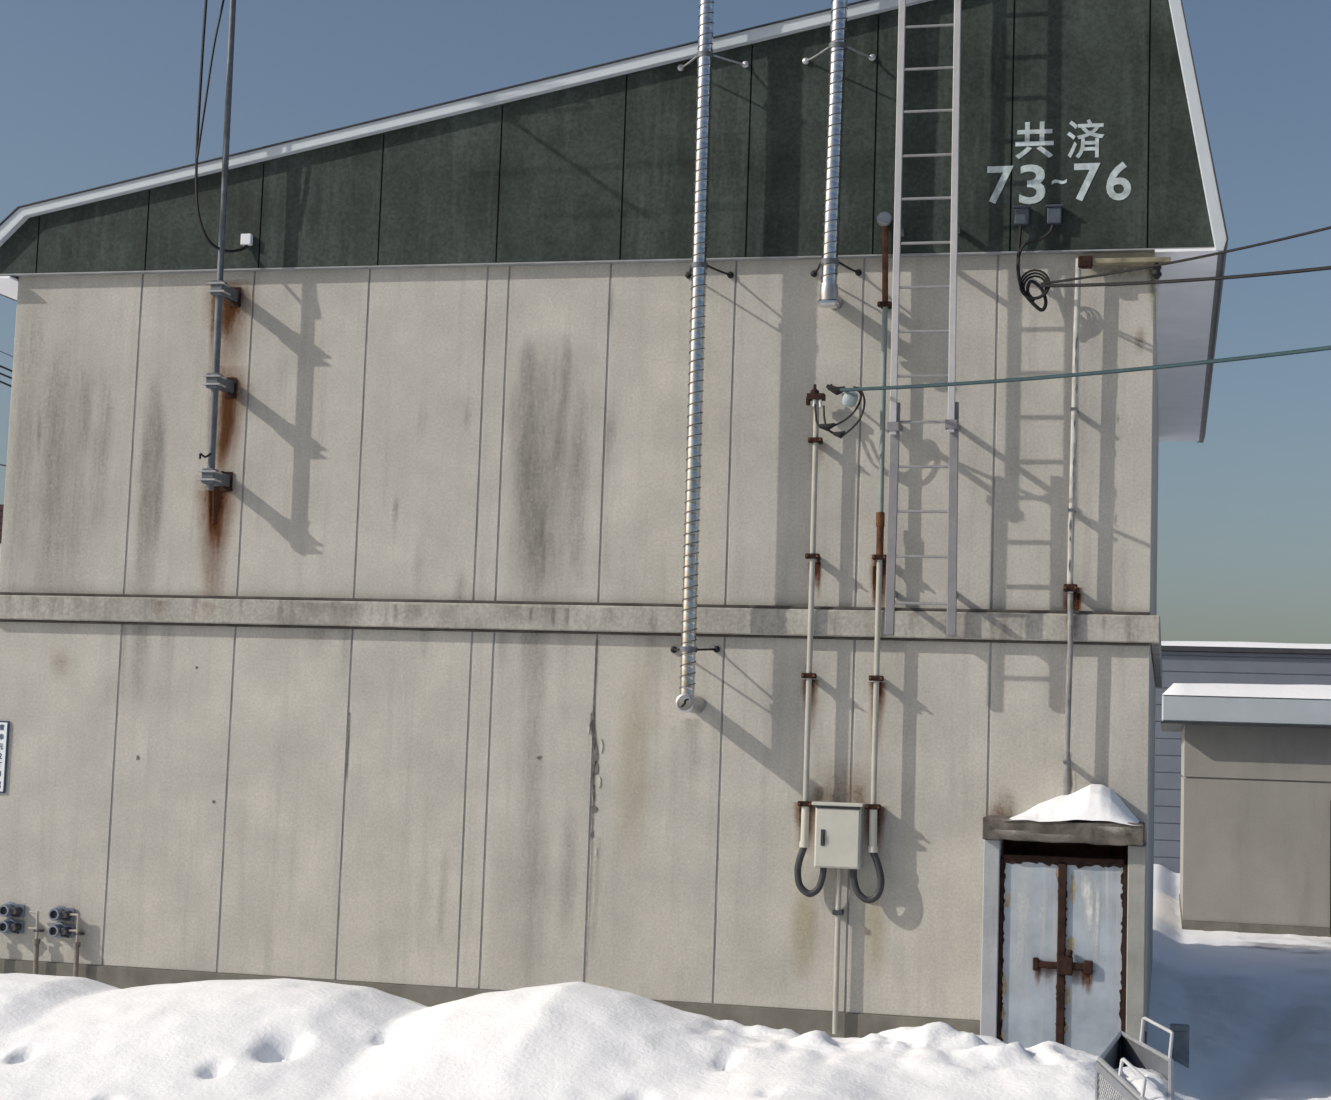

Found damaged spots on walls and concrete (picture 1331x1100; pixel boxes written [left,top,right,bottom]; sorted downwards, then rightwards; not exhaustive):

corrosion [213,293,244,335]
corrosion [217,377,241,458]
corrosion [204,486,229,552]
crack [588,640,598,929]
corrosion [1000,860,1124,1042]